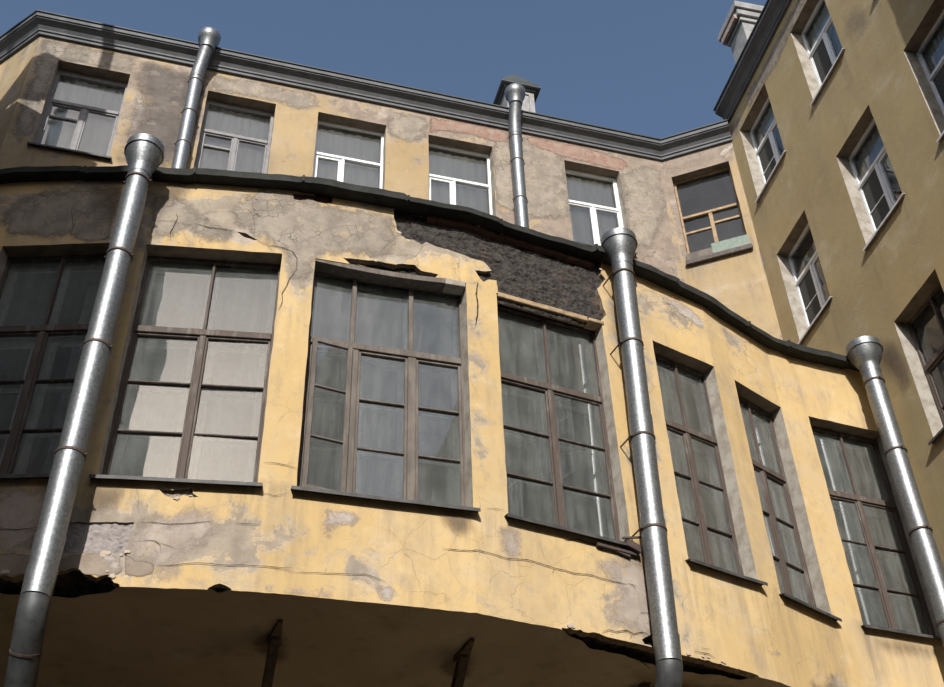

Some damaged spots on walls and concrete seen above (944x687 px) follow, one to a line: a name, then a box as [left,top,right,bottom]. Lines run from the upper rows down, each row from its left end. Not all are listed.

water stain [127,63,190,164]
peeling [4,190,122,242]
spalling [151,189,604,324]
peeling [388,112,514,210]
peeling [522,135,666,246]
peeling [0,485,47,594]
peeling [53,509,217,596]
spalling [161,487,196,500]
peeling [324,509,359,536]
crack [451,549,636,588]
crack [602,612,649,668]
spalling [682,650,747,679]